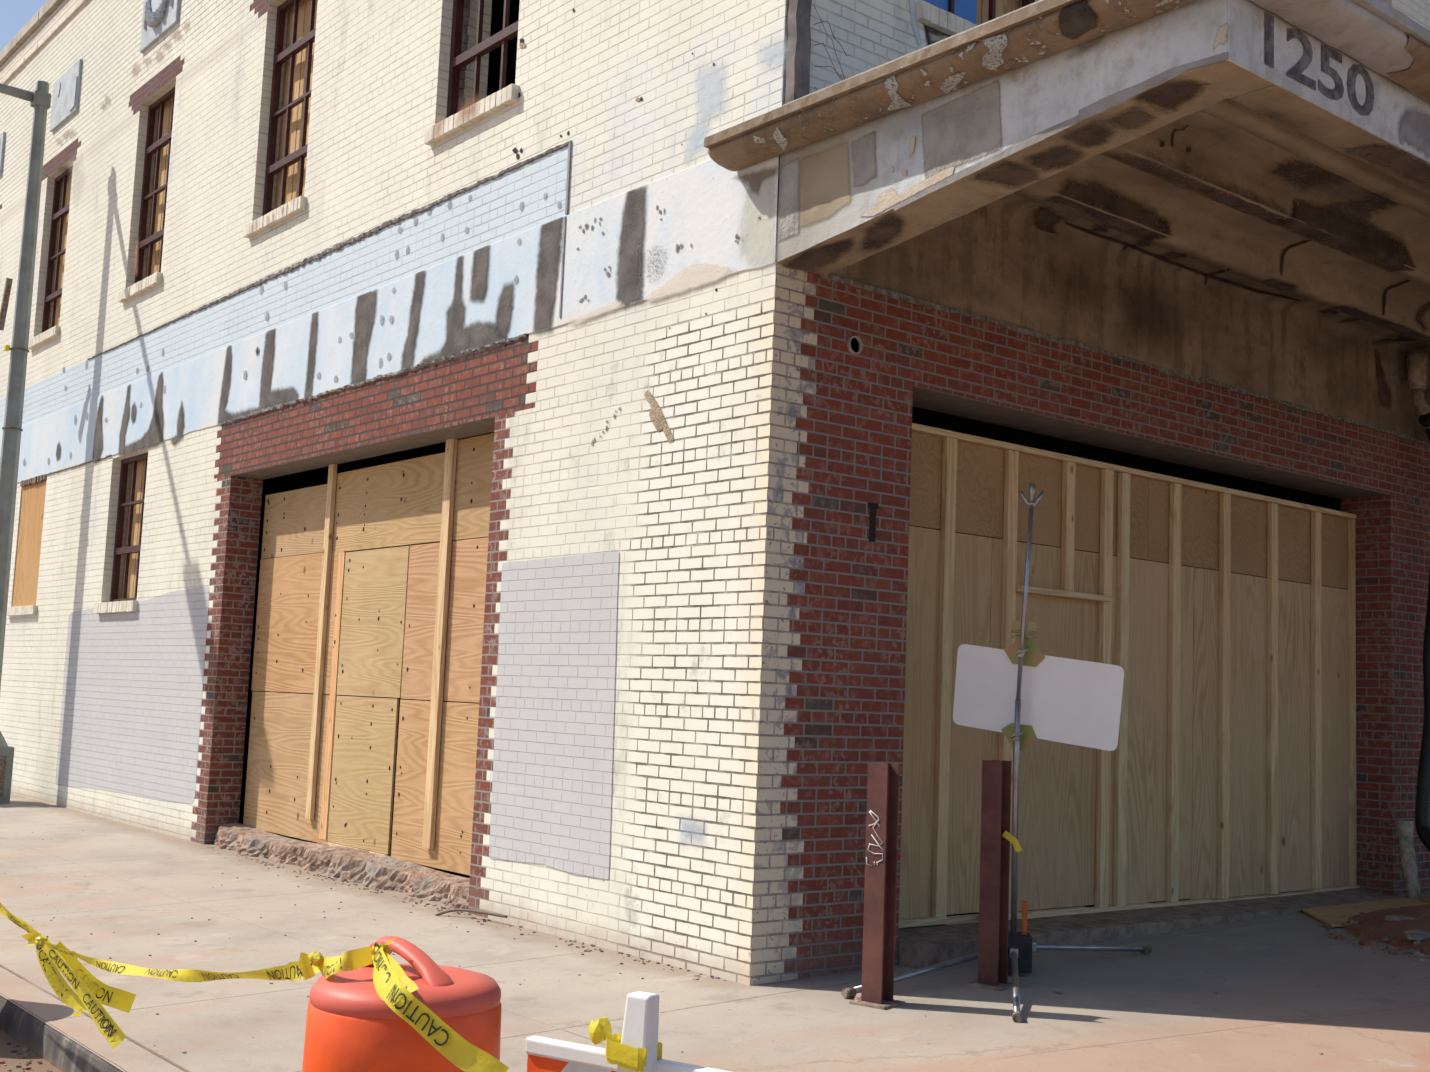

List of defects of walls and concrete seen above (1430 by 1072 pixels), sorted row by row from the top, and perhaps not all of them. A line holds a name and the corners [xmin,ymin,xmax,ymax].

peeling [1387,32,1430,100]
peeling [753,127,788,151]
peeling [799,23,1228,227]
damp [1399,109,1430,157]